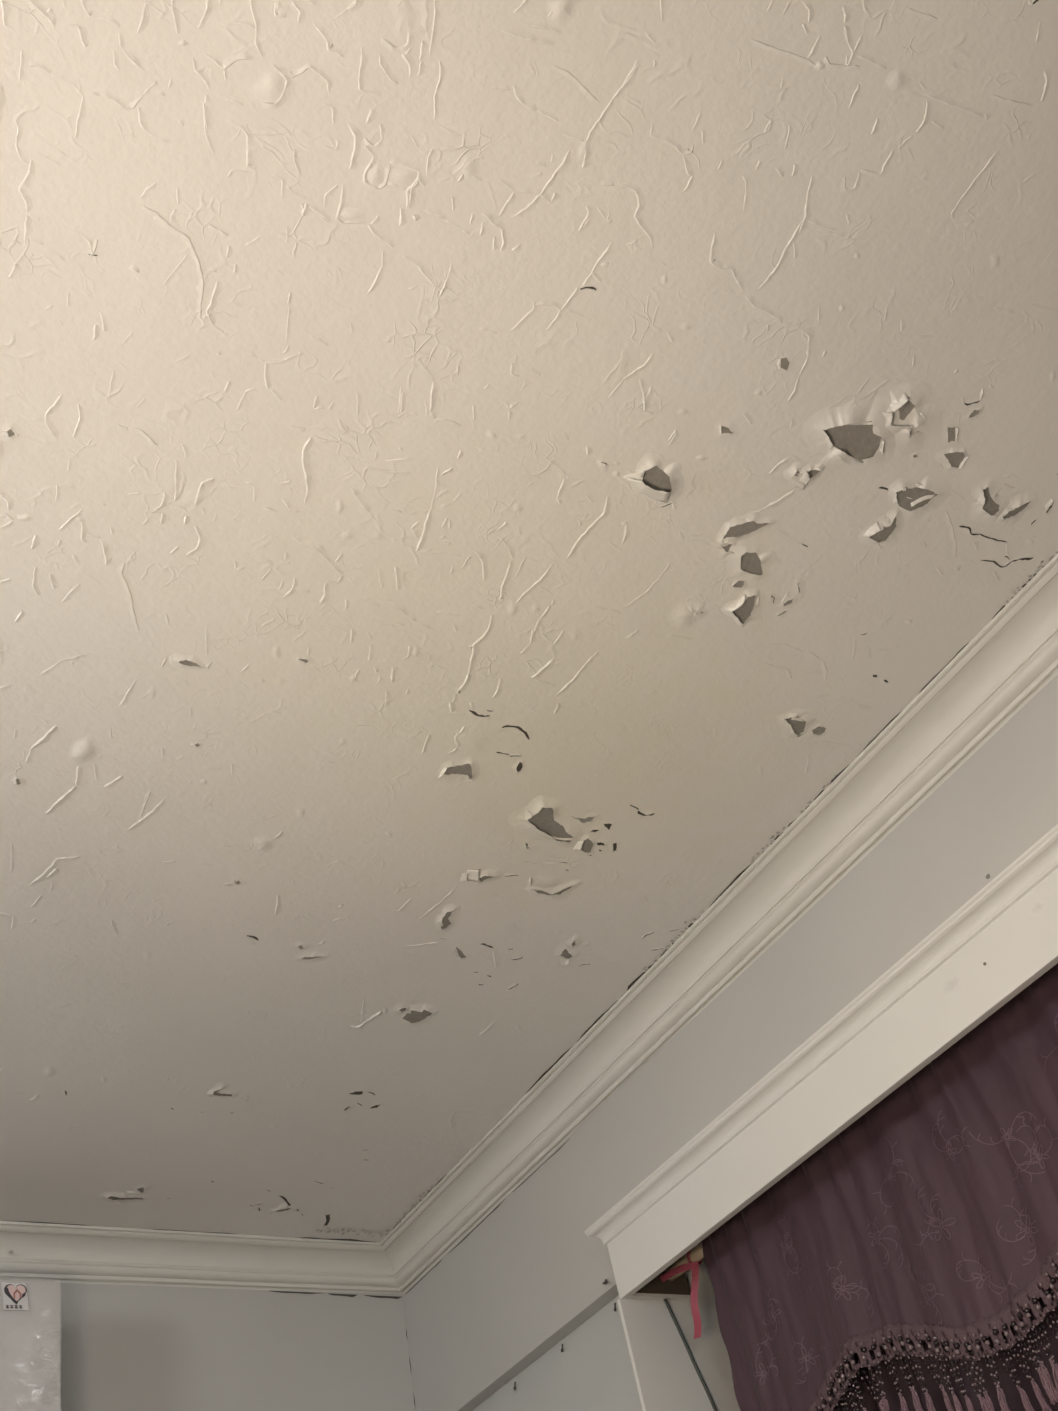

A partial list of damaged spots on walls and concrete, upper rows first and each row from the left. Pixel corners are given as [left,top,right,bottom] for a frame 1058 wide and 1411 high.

peeling [586,446,685,510]
peeling [783,380,994,550]
peeling [970,467,1058,528]
peeling [710,510,806,627]
peeling [775,708,831,738]
peeling [509,795,624,858]
peeling [401,867,584,961]
peeling [389,1001,441,1028]
peeling [98,1182,156,1206]